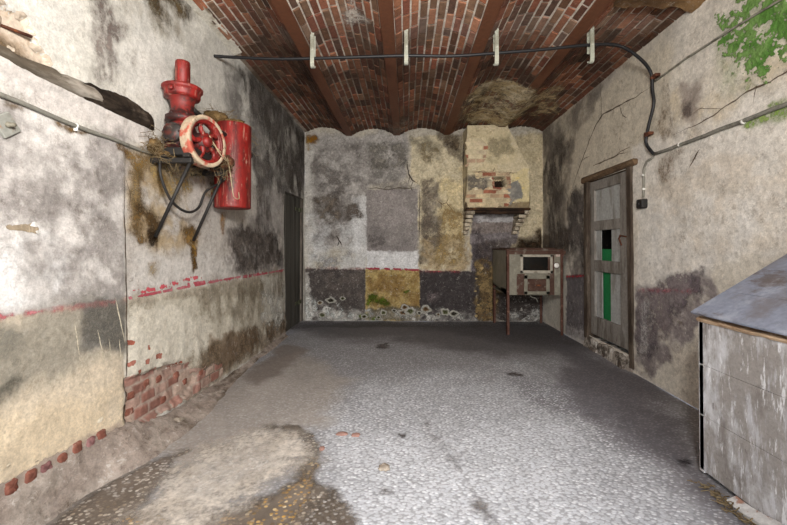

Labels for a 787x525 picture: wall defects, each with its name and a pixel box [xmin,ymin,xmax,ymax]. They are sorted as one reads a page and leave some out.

damp [149,0,191,21]
damp [345,0,364,23]
crack [574,88,649,182]
crack [674,71,787,135]
damp [130,170,144,210]
damp [232,68,363,274]
spalling [465,137,525,208]
damp [201,317,286,379]
spalling [0,345,223,500]
damp [55,425,358,525]